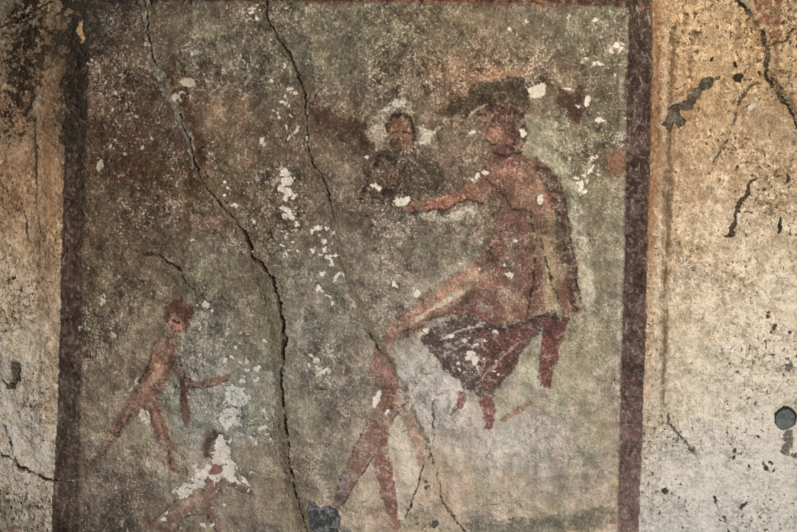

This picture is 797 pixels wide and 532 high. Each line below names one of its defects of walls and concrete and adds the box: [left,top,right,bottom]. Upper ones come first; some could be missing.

crack [0,1,53,28]
damp [0,0,140,185]
flaking render [661,76,720,133]
crack [706,0,797,175]
peeling [275,167,300,258]
crack [136,0,311,532]
peeling [310,225,345,305]
crack [264,0,466,532]
crack [0,425,117,489]
peeling [172,326,273,499]
flaking render [307,501,349,532]